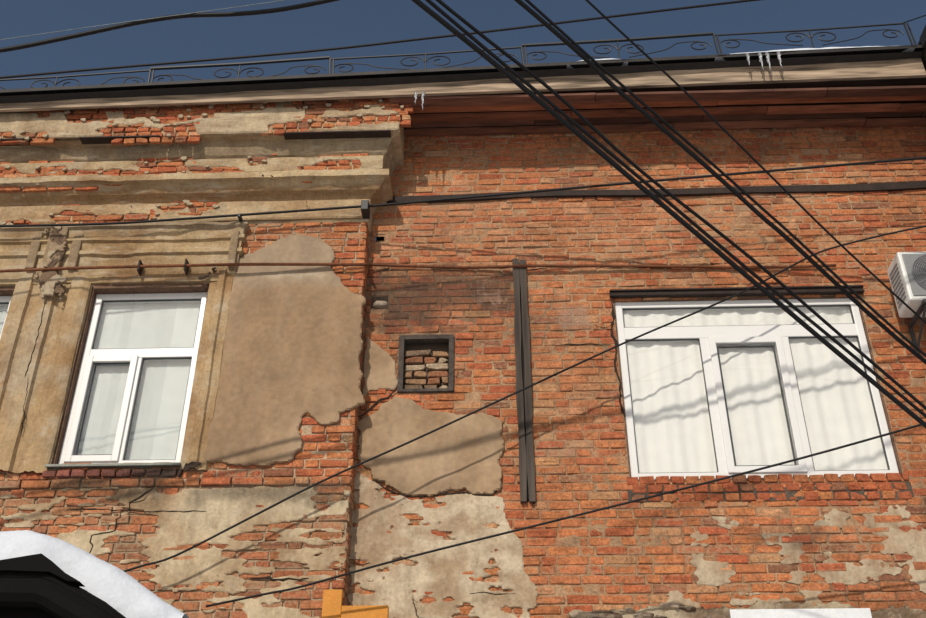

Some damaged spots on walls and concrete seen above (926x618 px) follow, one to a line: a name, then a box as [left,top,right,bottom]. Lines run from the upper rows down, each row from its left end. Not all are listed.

flaking render [0,130,55,145]
flaking render [0,153,277,193]
flaking render [27,98,413,146]
flaking render [298,153,368,170]
flaking render [0,200,229,300]
crack [21,304,45,434]
flaking render [0,235,538,618]
crack [67,484,204,553]
flaking render [711,516,740,529]
flaking render [690,526,793,606]
flaking render [753,505,926,604]